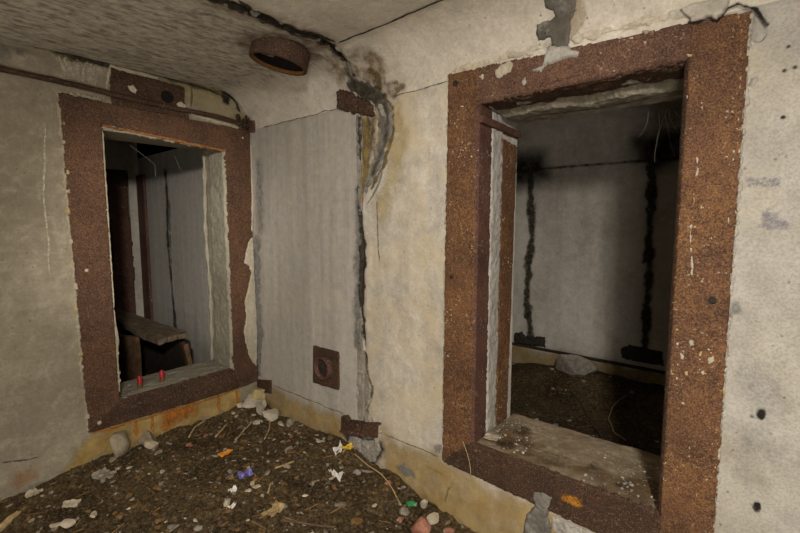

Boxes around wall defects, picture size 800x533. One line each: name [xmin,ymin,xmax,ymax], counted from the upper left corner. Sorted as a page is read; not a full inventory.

water stain [353,51,404,96]
flaking render [570,0,730,45]
flaking render [244,140,258,371]
crack [354,117,382,370]